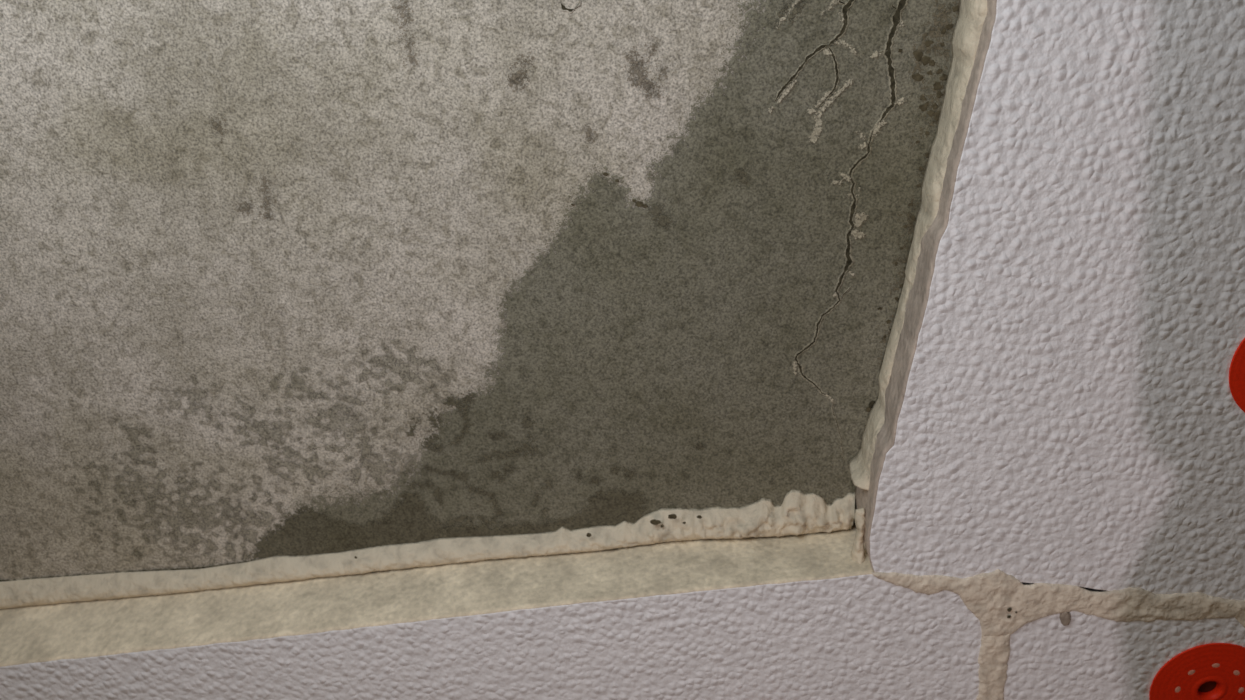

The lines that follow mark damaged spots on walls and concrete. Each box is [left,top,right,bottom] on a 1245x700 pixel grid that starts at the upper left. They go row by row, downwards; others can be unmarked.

leakage [72,0,959,569]
peeling [560,0,581,14]
crack [768,0,908,461]
spalling [874,0,959,377]